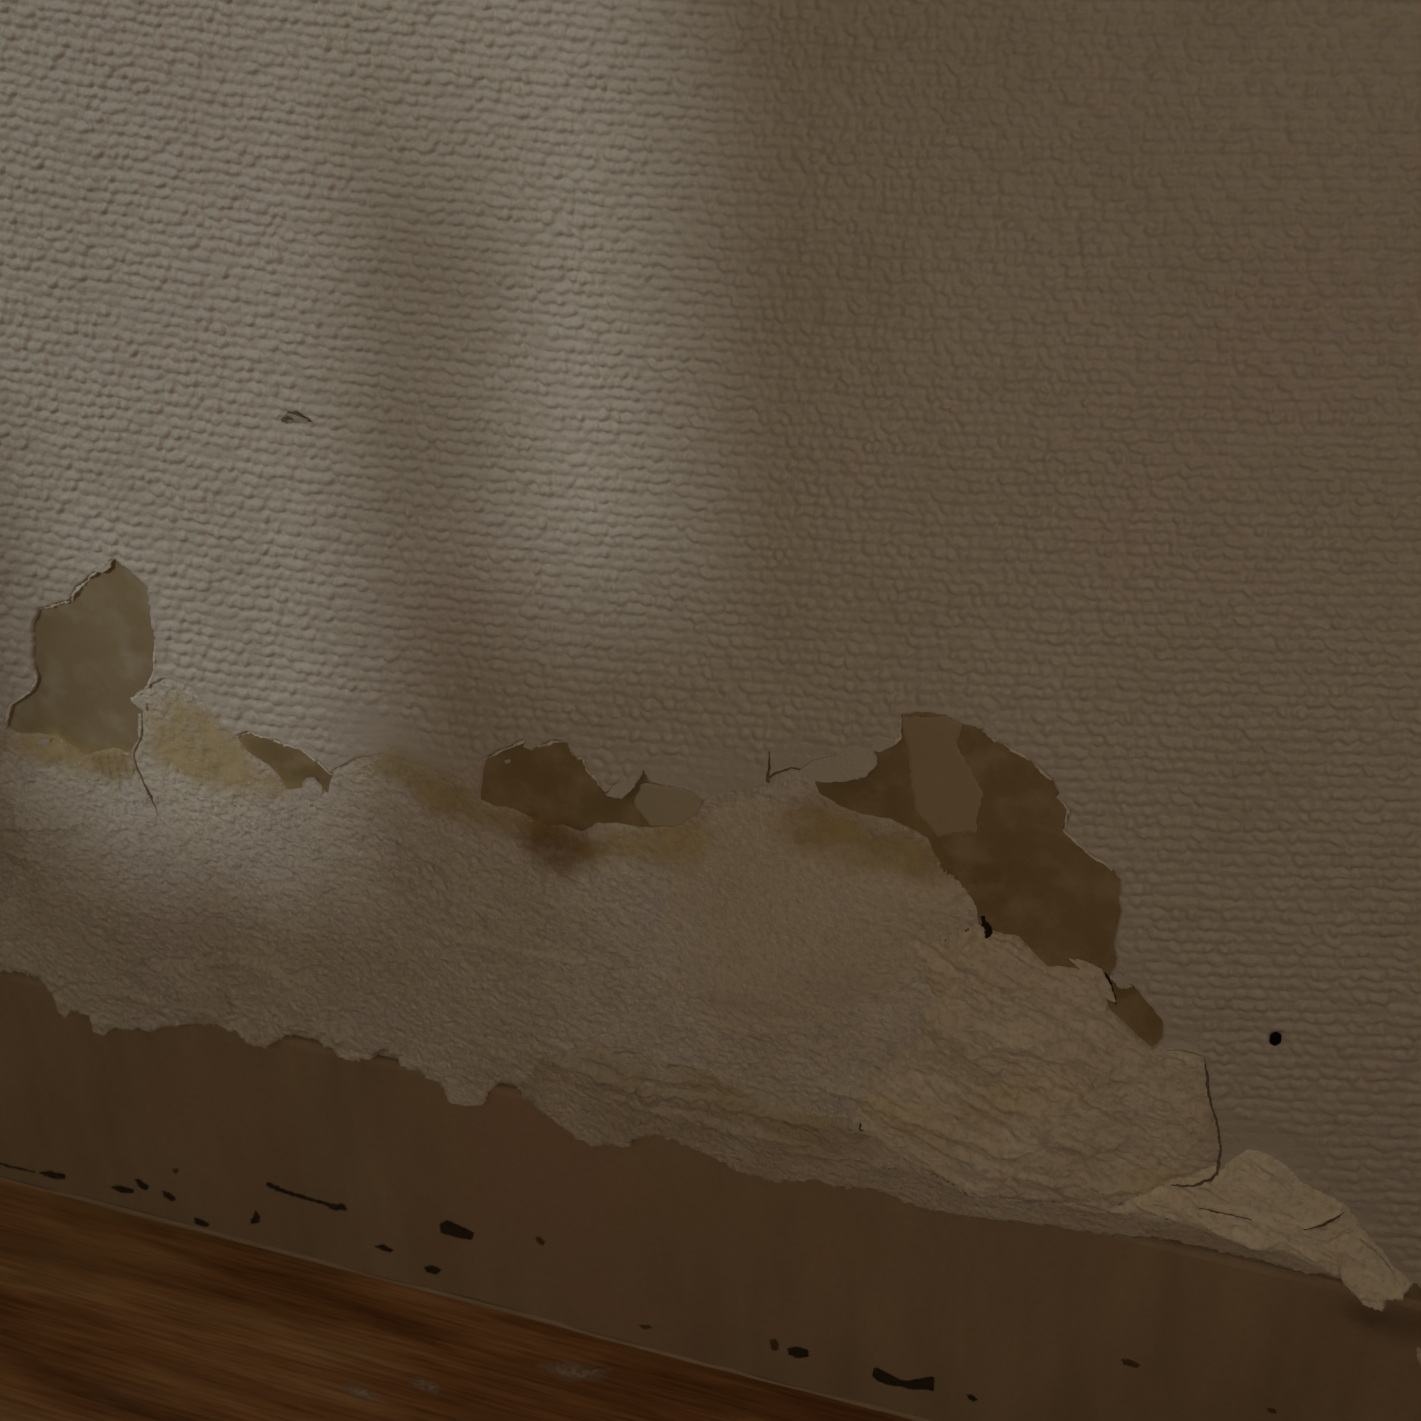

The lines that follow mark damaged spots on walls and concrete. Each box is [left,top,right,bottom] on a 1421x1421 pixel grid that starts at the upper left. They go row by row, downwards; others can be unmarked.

peeling [3,559,156,755]
peeling [235,731,333,793]
peeling [481,738,703,831]
spalling [517,712,1413,1312]
crack [1171,1059,1252,1221]
peeling [111,1179,176,1202]
peeling [439,1220,474,1240]
crack [1304,1213,1344,1230]
peeling [769,1338,810,1358]